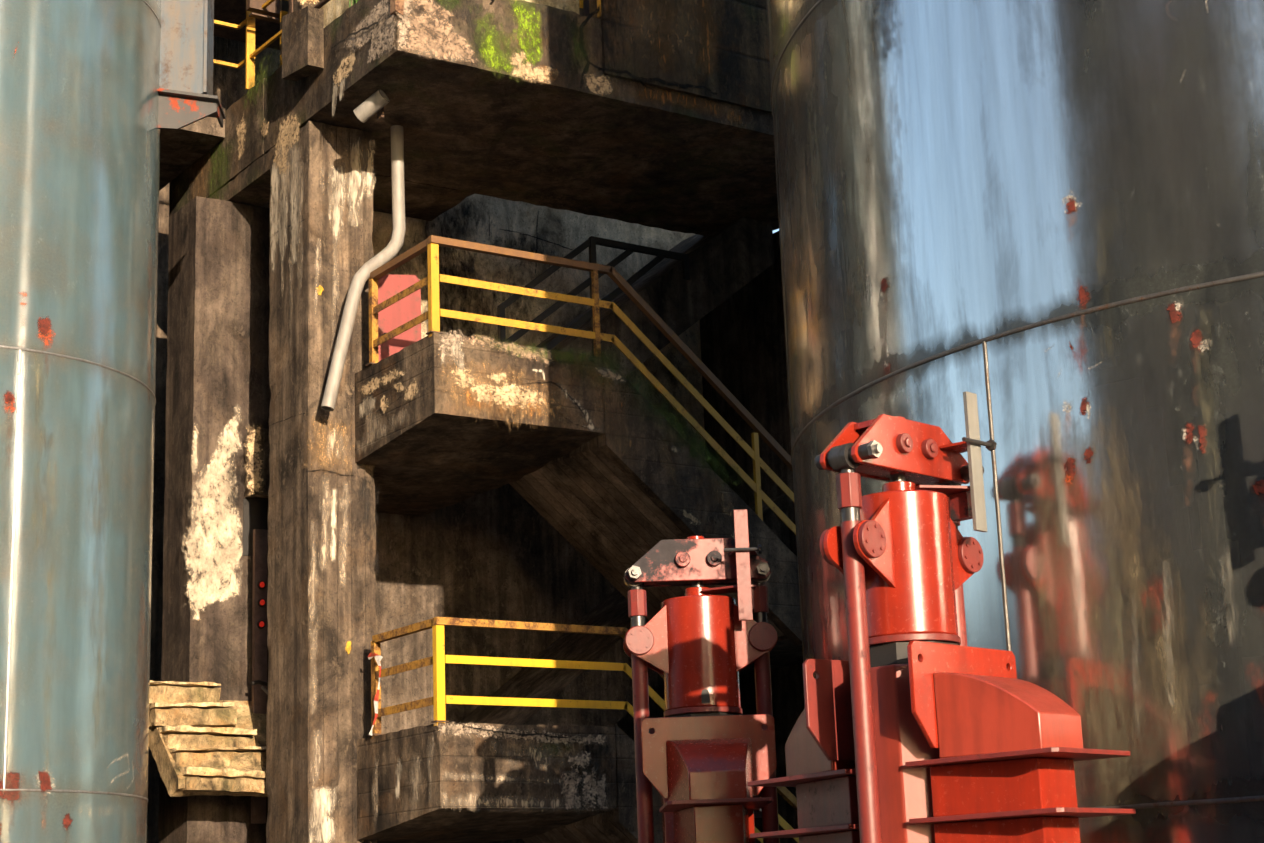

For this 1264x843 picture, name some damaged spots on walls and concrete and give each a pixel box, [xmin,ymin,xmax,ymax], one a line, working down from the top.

spalling [332,0,477,115]
rust [38,316,56,345]
spalling [358,369,418,444]
spalling [438,331,561,423]
rust [1183,423,1208,454]
peeling [186,406,264,620]
rust [0,769,55,803]